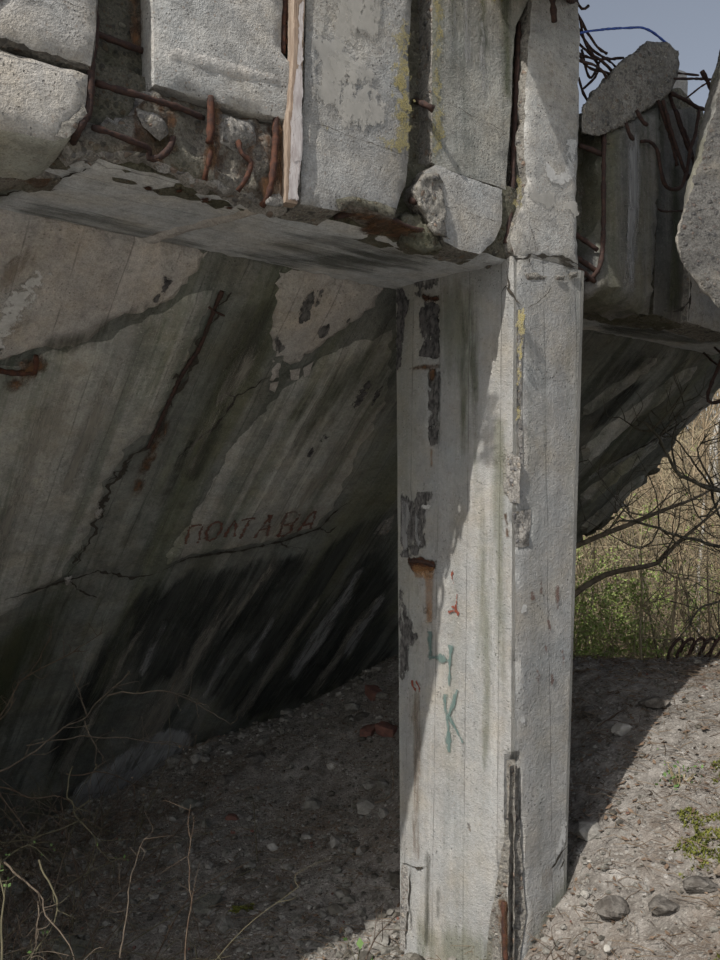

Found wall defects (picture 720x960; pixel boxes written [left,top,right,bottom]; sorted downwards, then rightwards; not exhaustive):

corrosion [260,124,283,197]
damp [0,259,54,352]
flaking render [0,209,208,360]
peeling [402,290,440,359]
crack [5,293,349,600]
peeling [428,425,439,447]
corrosion [408,556,437,586]
damp [51,517,396,810]
spalling [487,759,526,960]